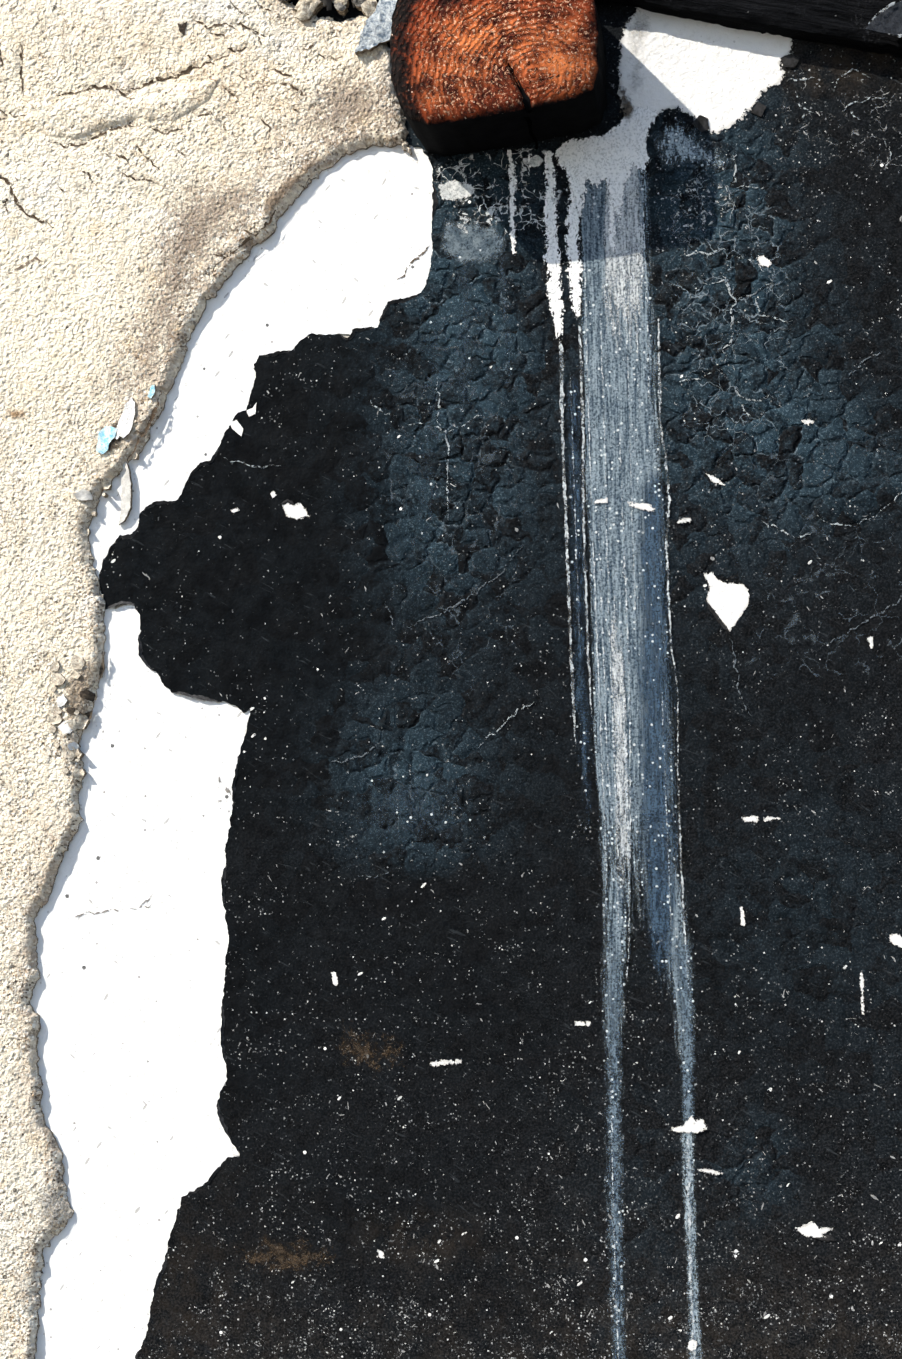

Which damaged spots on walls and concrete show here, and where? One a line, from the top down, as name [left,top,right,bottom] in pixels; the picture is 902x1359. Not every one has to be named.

crack [0,0,342,191]
peeling [523,155,543,167]
crack [0,177,54,228]
crack [6,257,47,275]
crack [209,207,278,276]
peeling [704,572,750,634]
peeling [30,145,475,1359]
water stain [443,89,721,1359]